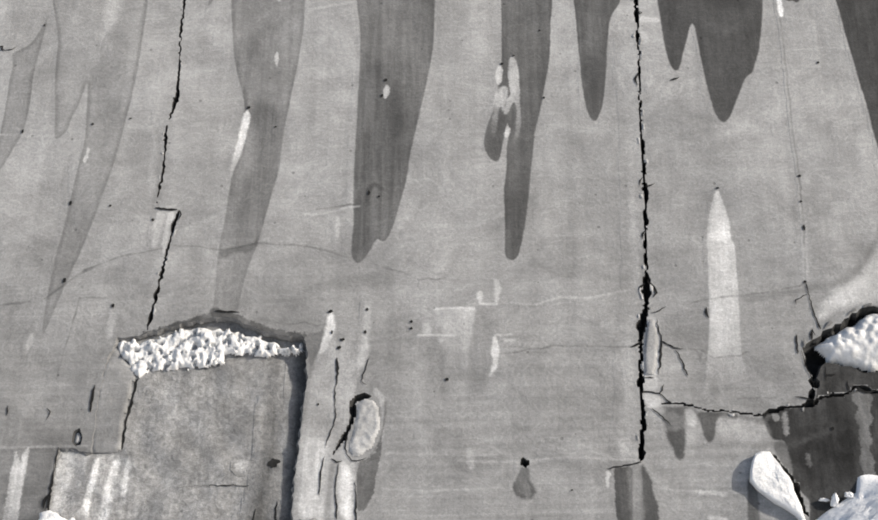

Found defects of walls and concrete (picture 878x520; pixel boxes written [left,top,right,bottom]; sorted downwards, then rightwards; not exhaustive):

damp [0,0,150,357]
crack [121,378,139,449]
crack [0,0,354,330]
damp [141,0,216,257]
spalling [50,317,308,520]
damp [0,275,522,520]
damp [207,0,437,309]
crack [318,358,390,520]
damp [482,0,555,262]
crack [496,0,878,469]
damp [509,0,878,520]
spalling [802,303,878,403]